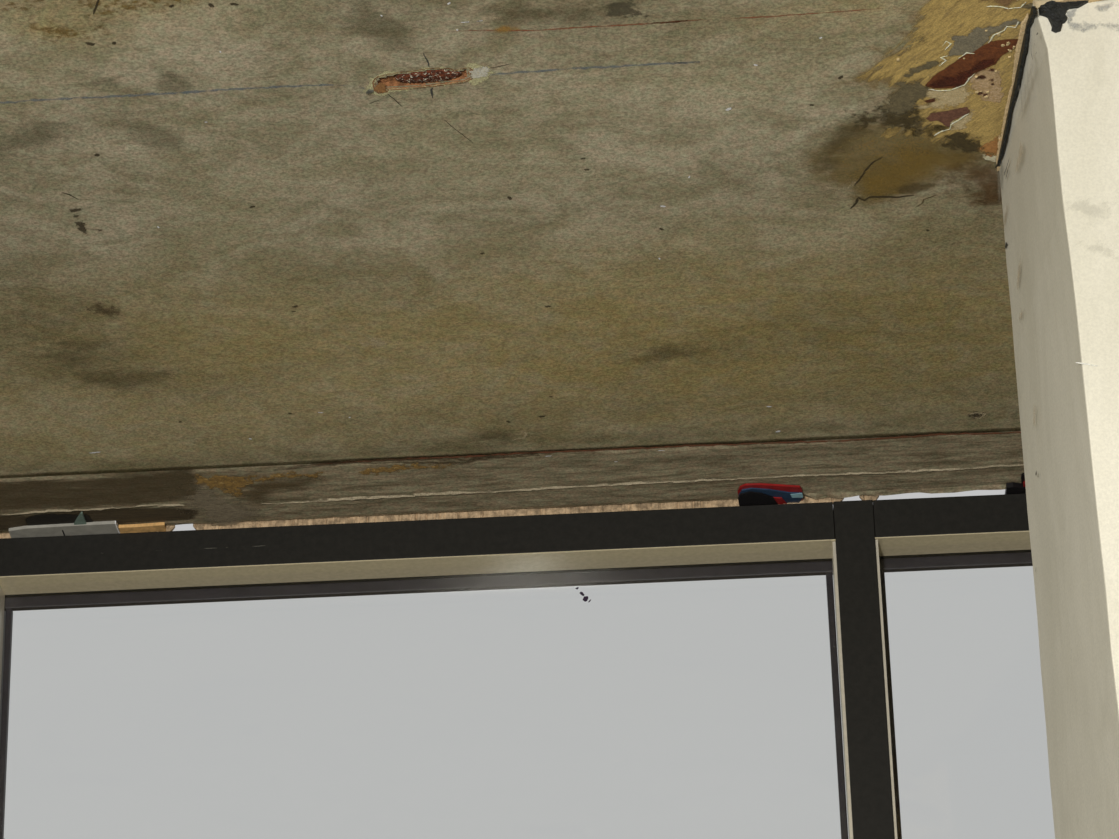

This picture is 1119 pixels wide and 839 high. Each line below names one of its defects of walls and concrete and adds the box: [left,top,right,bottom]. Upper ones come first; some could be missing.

peeling [854,0,1101,171]
leakage [816,124,1002,204]
leakage [0,470,198,531]